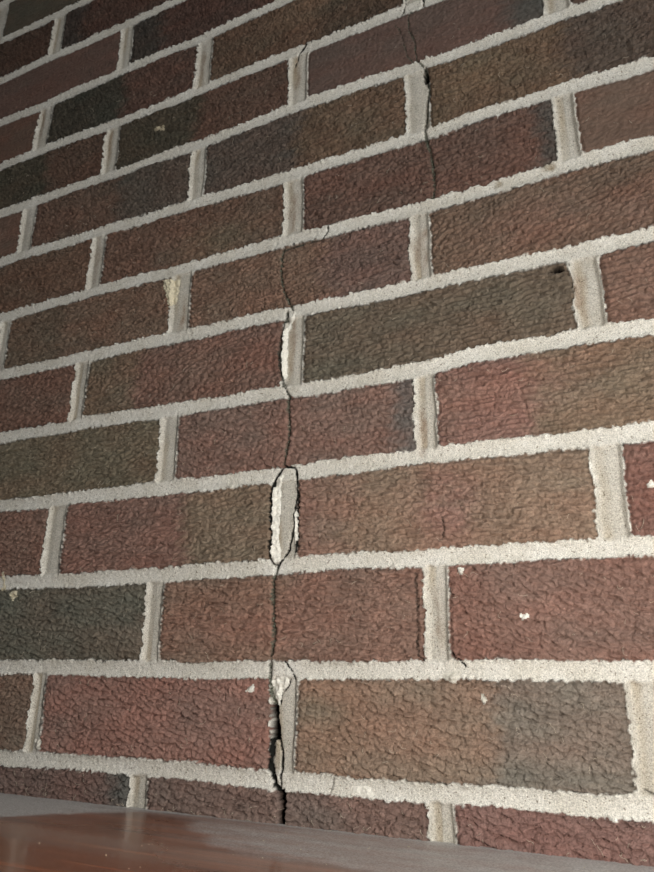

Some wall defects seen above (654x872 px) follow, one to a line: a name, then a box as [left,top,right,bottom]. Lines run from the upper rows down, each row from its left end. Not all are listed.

crack [395,0,436,199]
crack [268,226,329,824]